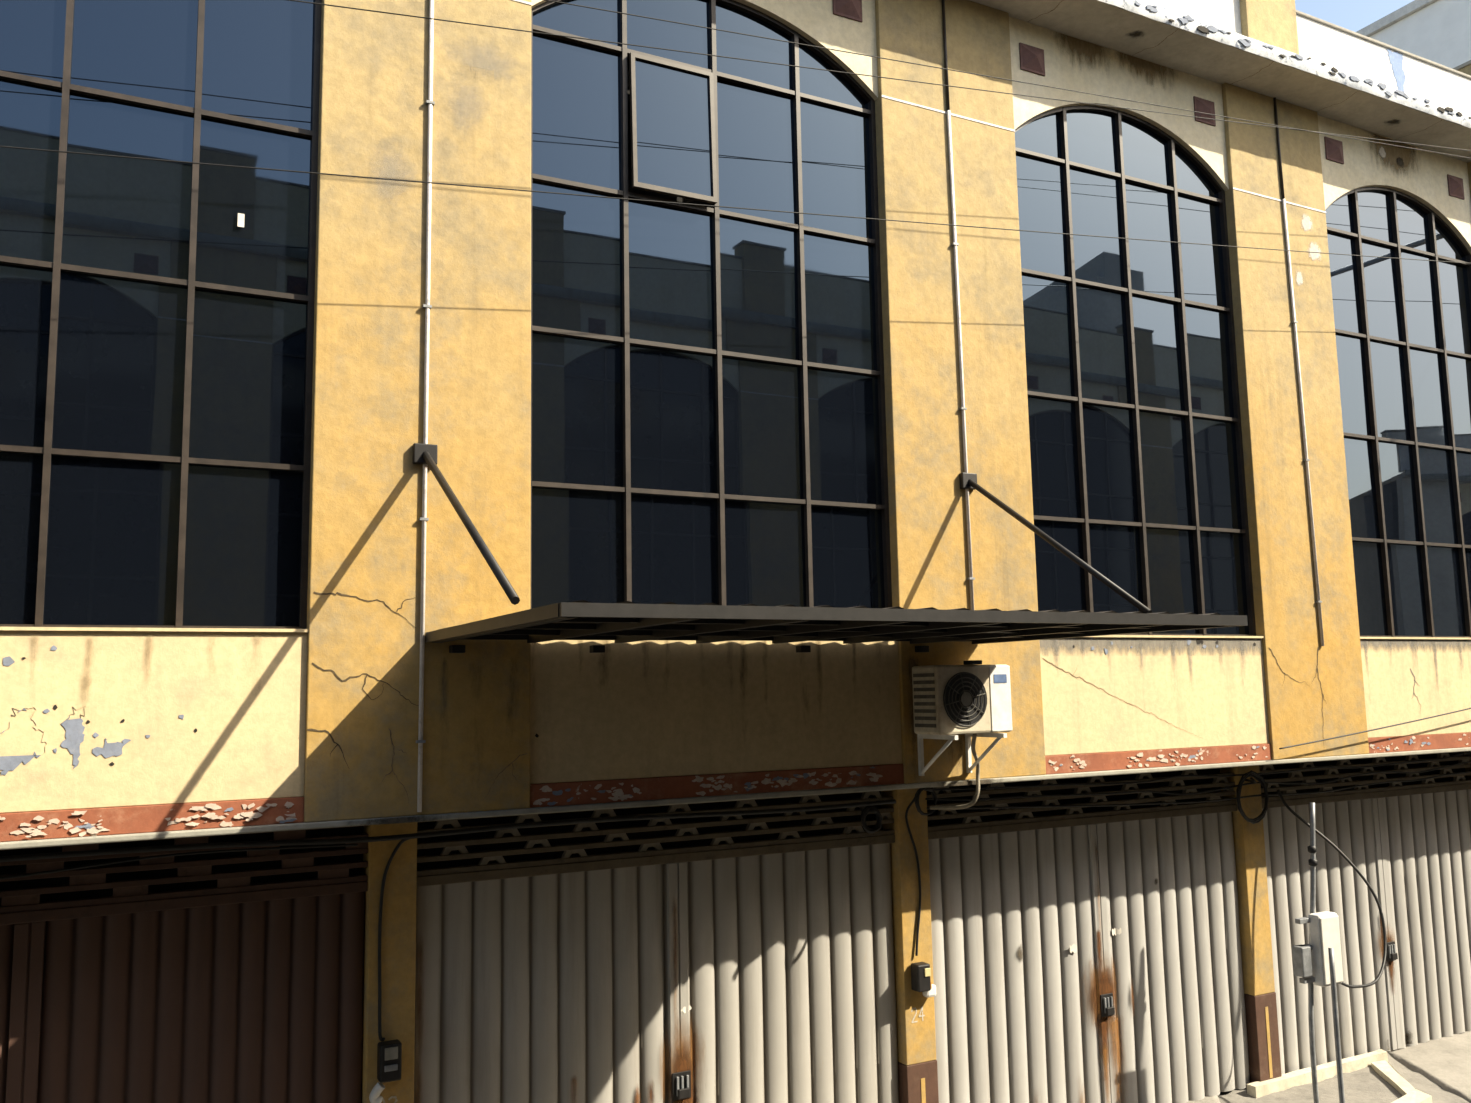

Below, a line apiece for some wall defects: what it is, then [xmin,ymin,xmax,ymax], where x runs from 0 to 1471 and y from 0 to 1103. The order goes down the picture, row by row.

peeling [1135,2,1471,119]
crack [314,592,416,628]
crack [1269,647,1326,739]
peeling [0,705,150,775]
crack [307,662,419,800]
peeling [1049,755,1087,771]
peeling [1127,750,1203,768]
peeling [0,811,109,837]
peeling [165,802,297,827]
corrosion [1380,917,1394,987]
corrosion [1090,931,1134,1102]
corrosion [635,1037,698,1103]